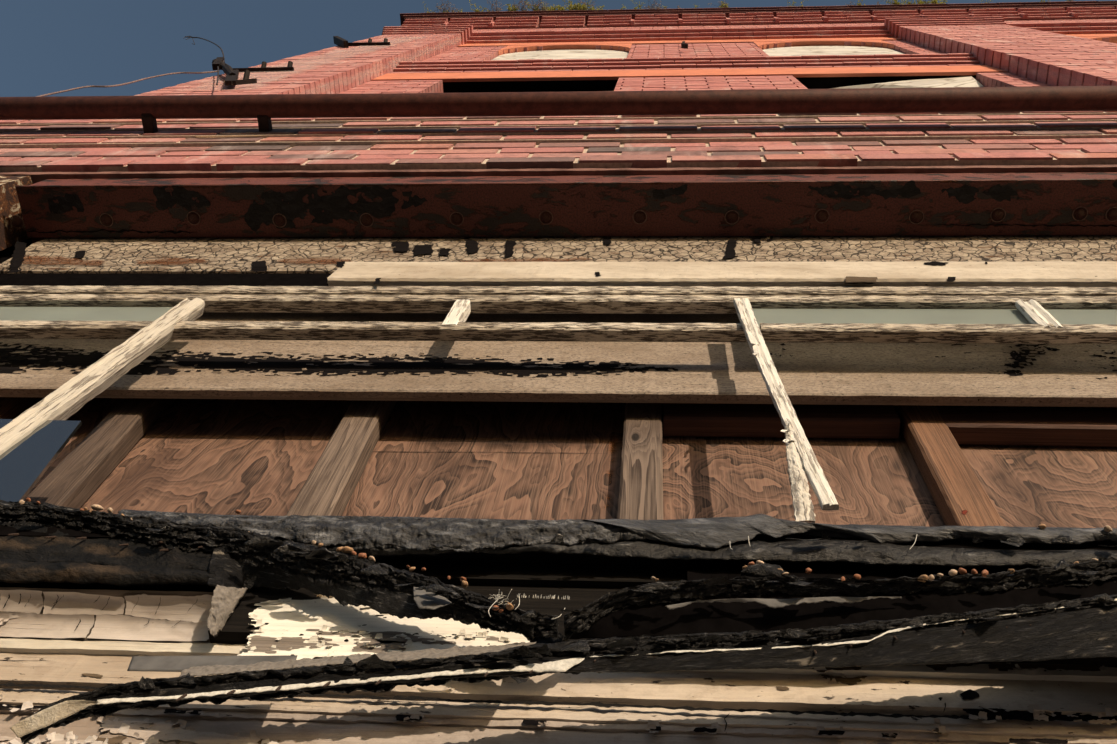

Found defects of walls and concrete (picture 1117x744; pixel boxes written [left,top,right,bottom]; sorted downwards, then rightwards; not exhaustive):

peeling [0,342,109,375]
peeling [125,350,678,378]
peeling [0,590,213,641]
peeling [237,597,530,660]
peeling [809,666,867,685]
peeling [0,701,47,713]
peeling [962,704,1117,725]
peeling [87,723,160,744]
peeling [647,720,663,733]